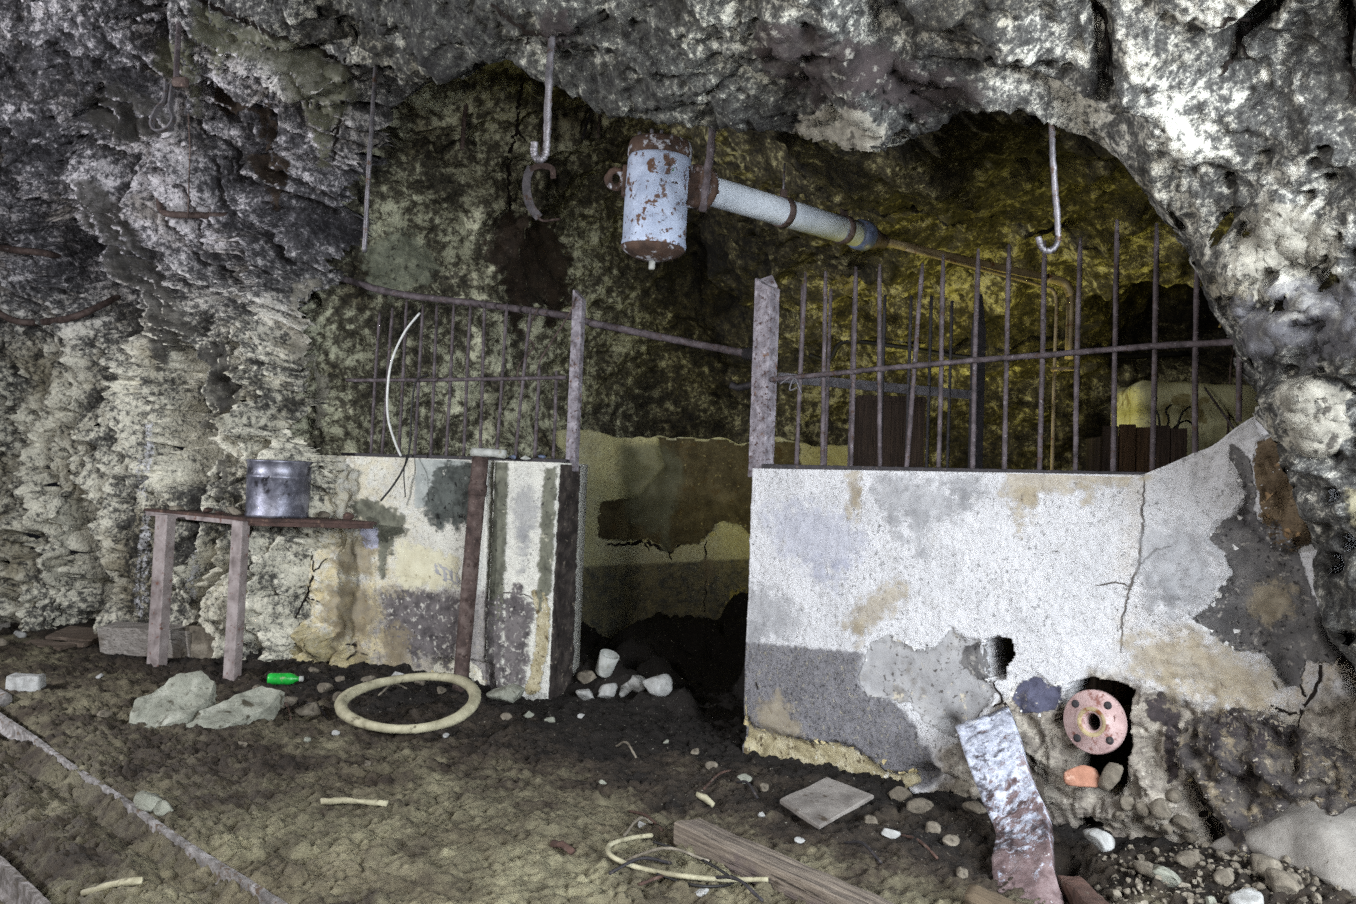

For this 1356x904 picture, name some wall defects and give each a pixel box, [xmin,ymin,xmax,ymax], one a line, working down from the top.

peeling [597,437,752,552]
peeling [774,441,801,465]
damp [348,459,471,671]
crack [1097,477,1172,651]
peeling [1193,444,1344,687]
spalling [525,590,550,695]
peeling [858,626,1062,740]
spalling [744,697,921,788]
spalling [1175,707,1356,857]